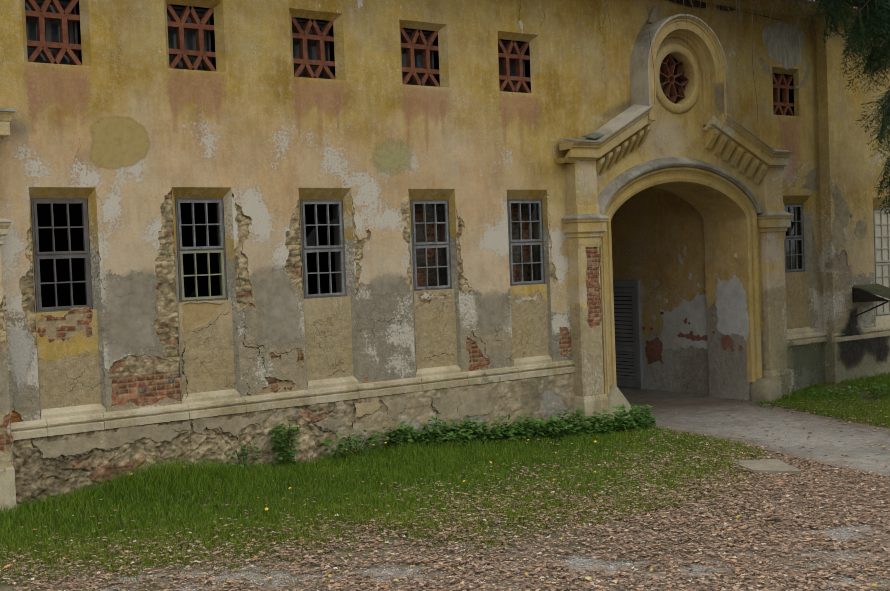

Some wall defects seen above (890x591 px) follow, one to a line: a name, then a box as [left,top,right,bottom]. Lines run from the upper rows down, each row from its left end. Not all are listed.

peeling [762,21,805,70]
spalling [284,200,302,290]
flaking render [19,209,93,349]
flaking render [109,188,256,409]
flaking render [585,245,603,328]
flaking render [642,246,750,365]
crack [243,333,301,373]
flaking render [466,337,491,371]
flaking render [559,327,572,358]
flaking render [260,376,296,394]
flaking render [353,398,381,417]
flaking render [31,413,266,458]